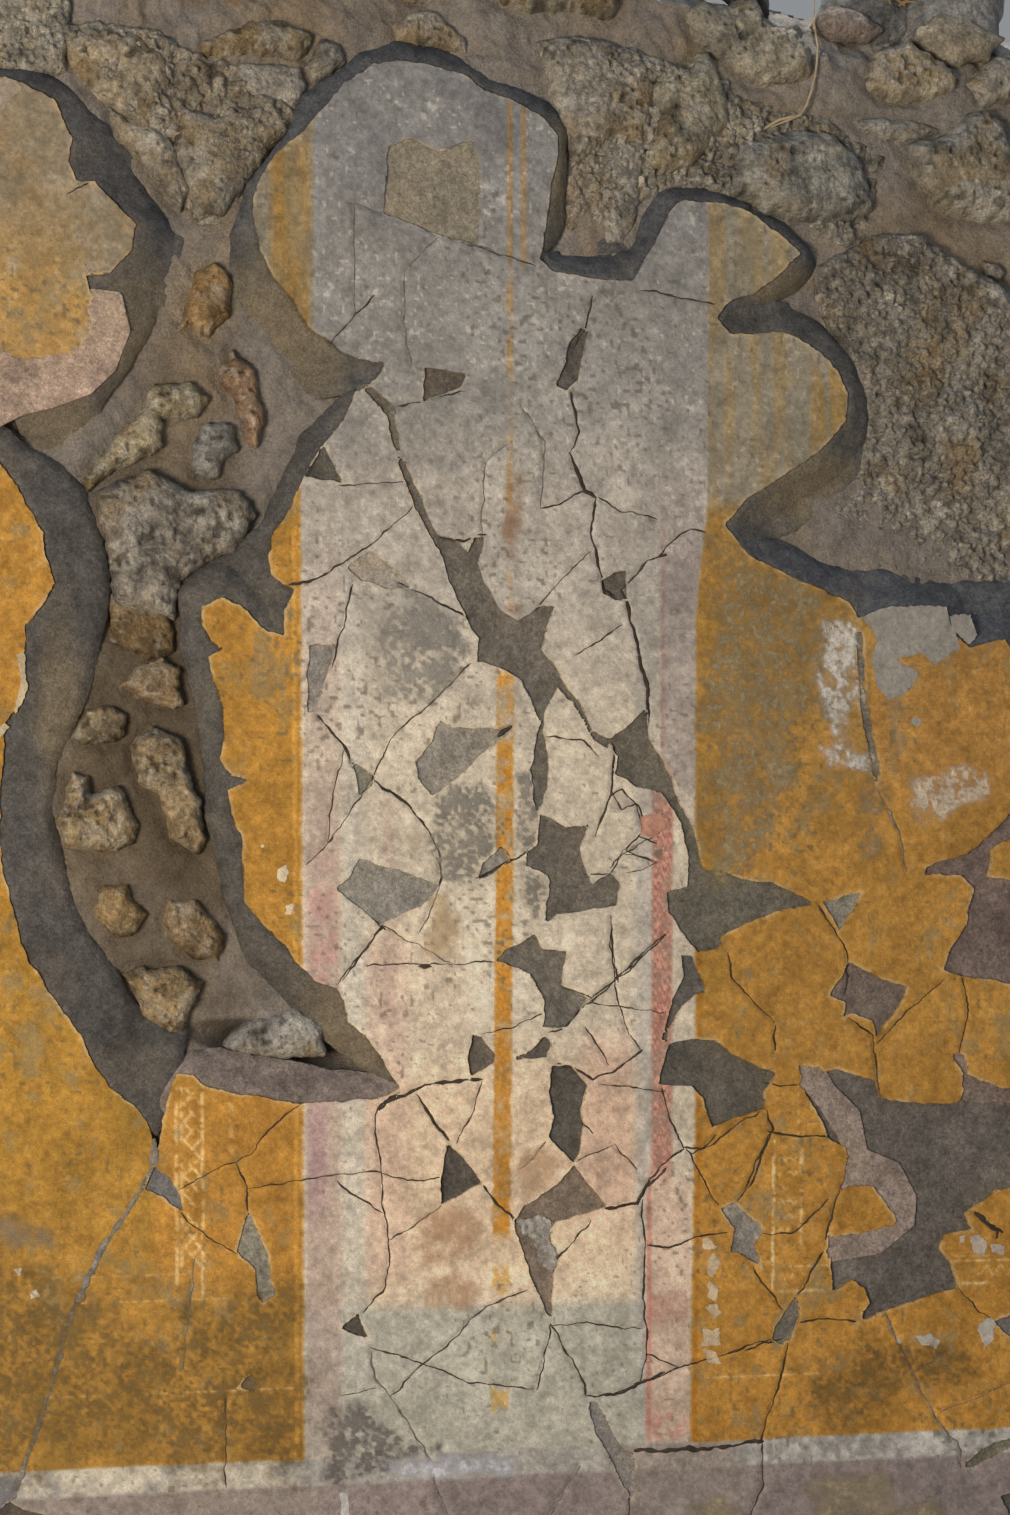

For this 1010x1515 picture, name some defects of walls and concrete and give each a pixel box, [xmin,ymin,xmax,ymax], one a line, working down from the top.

spalling [0,262,130,427]
spalling [565,36,1010,583]
crack [288,481,413,667]
crack [306,663,534,985]
crack [397,582,467,618]
crack [440,392,706,721]
crack [547,735,659,875]
spalling [348,384,860,1126]
spalling [440,1145,481,1203]
crack [11,905,1010,1515]
spalling [497,935,605,1316]
spalling [798,1053,1010,1319]